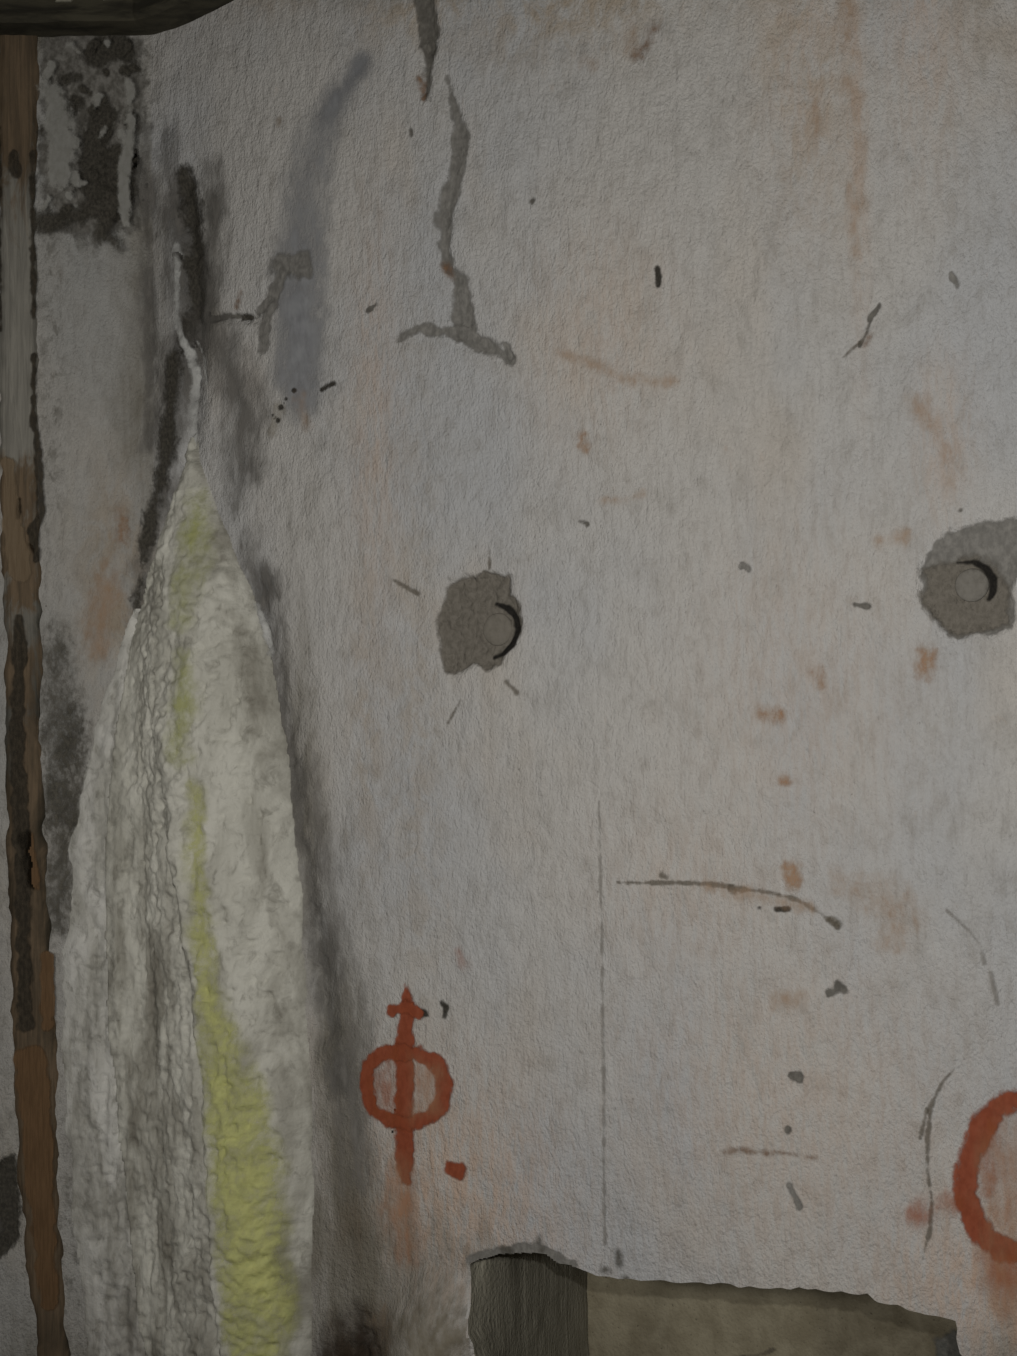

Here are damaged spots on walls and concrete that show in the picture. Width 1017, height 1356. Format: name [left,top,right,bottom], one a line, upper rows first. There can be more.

crack [413,0,439,100]
leakage [204,183,325,478]
leakage [240,545,277,615]
spalling [437,560,522,674]
spalling [920,519,1017,639]
leakage [41,627,83,934]
leakage [278,696,324,850]
spalling [466,1238,577,1267]